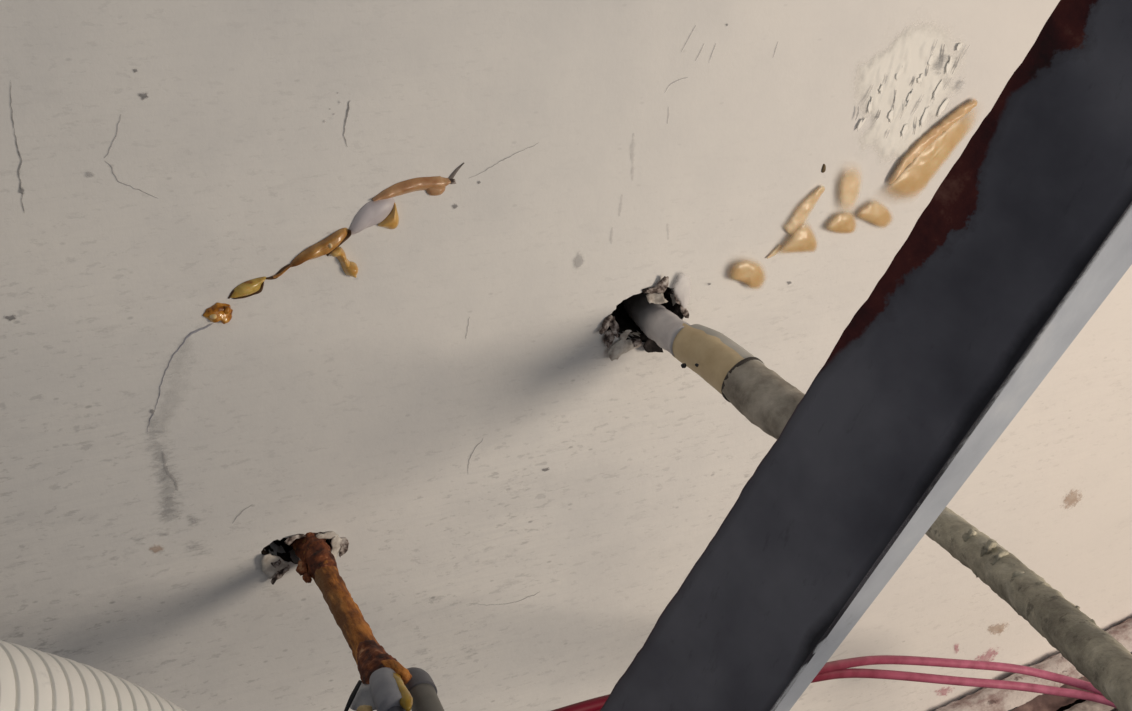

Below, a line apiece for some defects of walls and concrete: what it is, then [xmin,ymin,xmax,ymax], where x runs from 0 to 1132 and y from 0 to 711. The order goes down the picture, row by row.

crack [10,88,24,211]
crack [87,115,156,198]
spalling [599,273,691,361]
crack [147,323,213,432]
spalling [261,531,349,585]